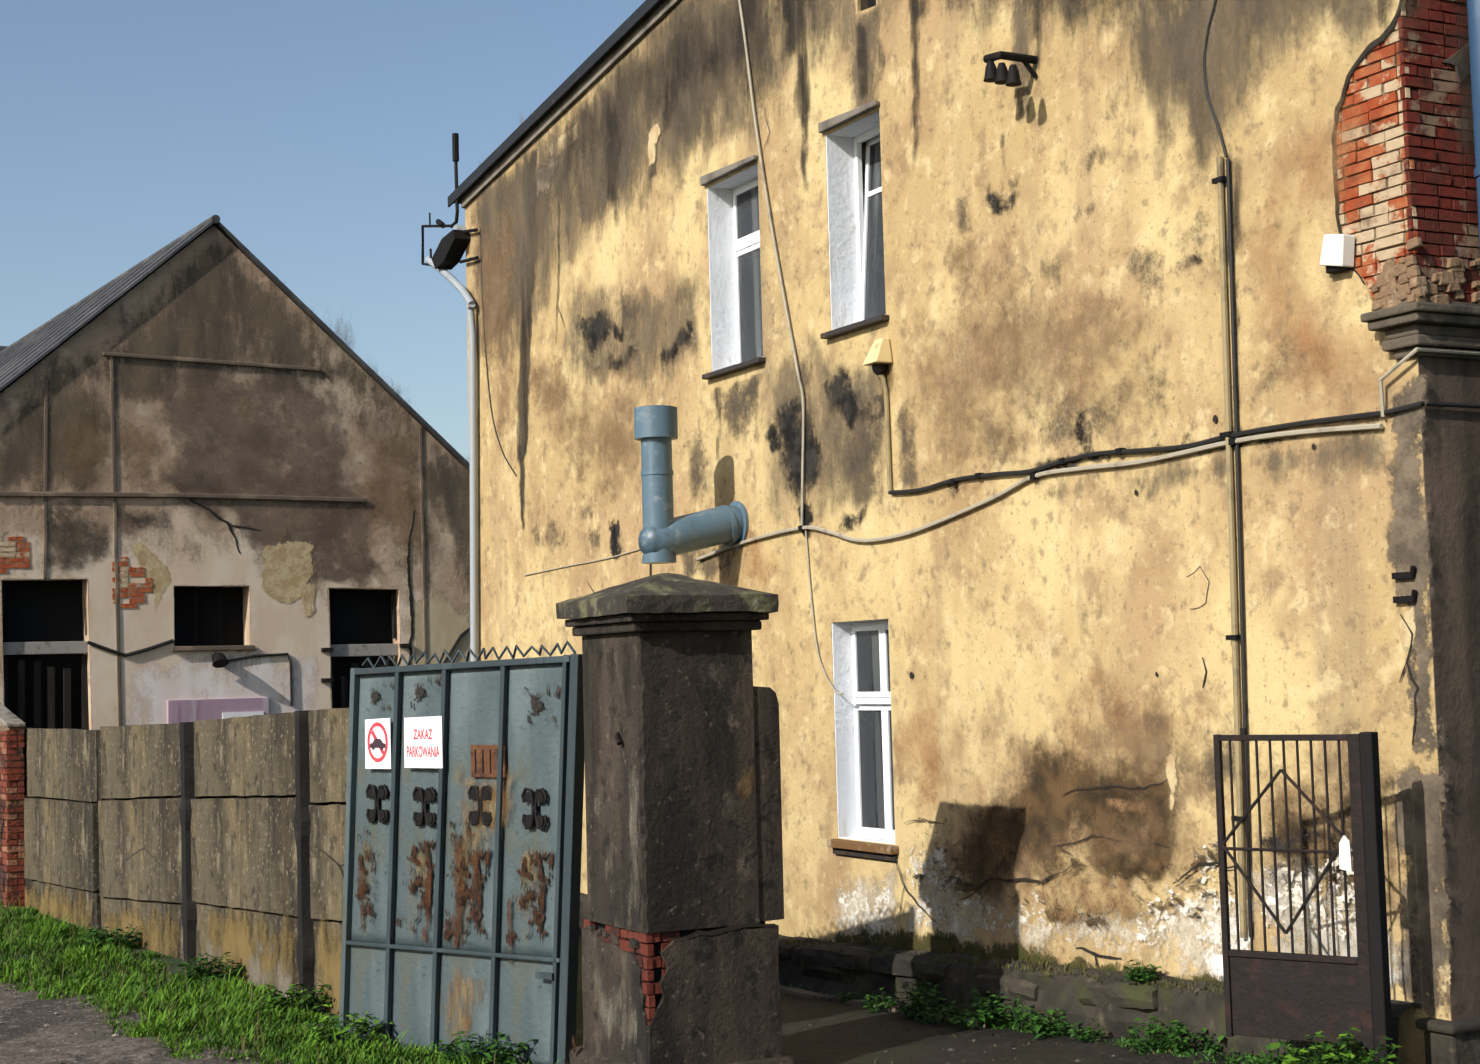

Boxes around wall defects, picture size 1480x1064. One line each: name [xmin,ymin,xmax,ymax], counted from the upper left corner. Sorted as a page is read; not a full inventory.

water stain [746,0,827,176]
flaking render [1331,0,1480,311]
water stain [498,216,696,539]
water stain [714,345,916,531]
flaking render [0,532,30,573]
flaking render [112,557,152,608]
crack [189,498,262,554]
crack [407,510,416,665]
crack [1399,614,1419,745]
spalling [584,919,680,1027]
crack [895,834,1234,965]
water stain [836,700,1358,982]